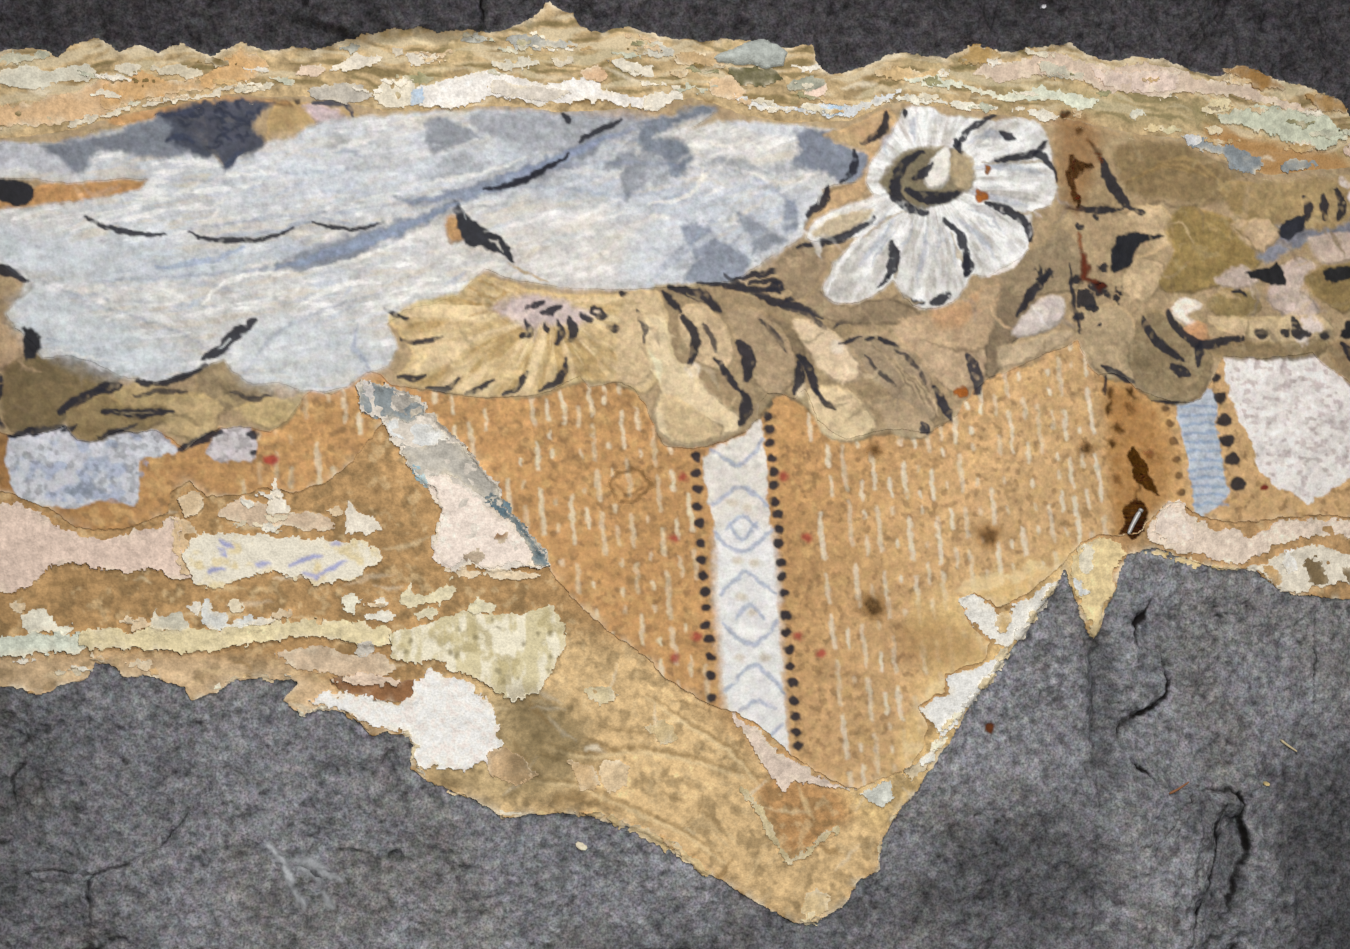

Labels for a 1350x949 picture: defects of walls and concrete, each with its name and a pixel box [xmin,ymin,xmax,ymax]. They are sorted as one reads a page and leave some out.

peeling [0,31,1350,175]
peeling [0,379,567,786]
crack [1132,607,1147,644]
crack [1116,672,1169,734]
crack [1191,787,1250,922]